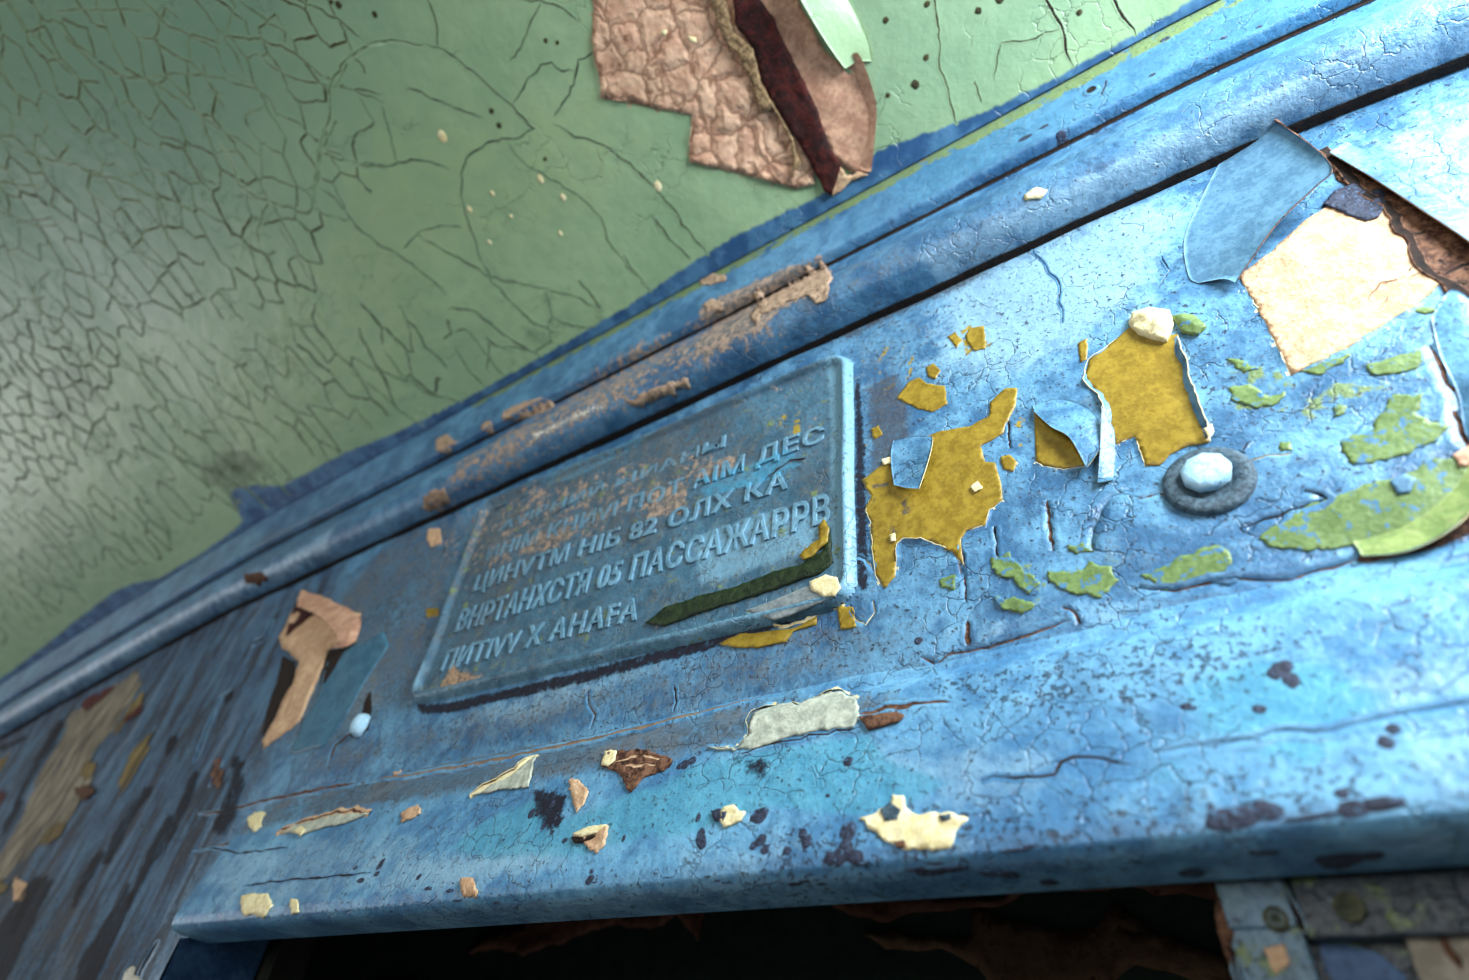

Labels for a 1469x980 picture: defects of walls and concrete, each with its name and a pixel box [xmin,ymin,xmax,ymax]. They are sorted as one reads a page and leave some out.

peeling [586,0,877,196]
crack [0,0,710,645]
peeling [1184,119,1469,563]
peeling [862,307,1214,591]
crack [917,525,1087,667]
crack [1039,500,1063,552]
peeling [247,805,372,836]
peeling [262,589,389,755]
peeling [600,748,673,793]
peeling [706,685,952,757]
peeling [859,794,968,851]
crack [980,751,1131,784]